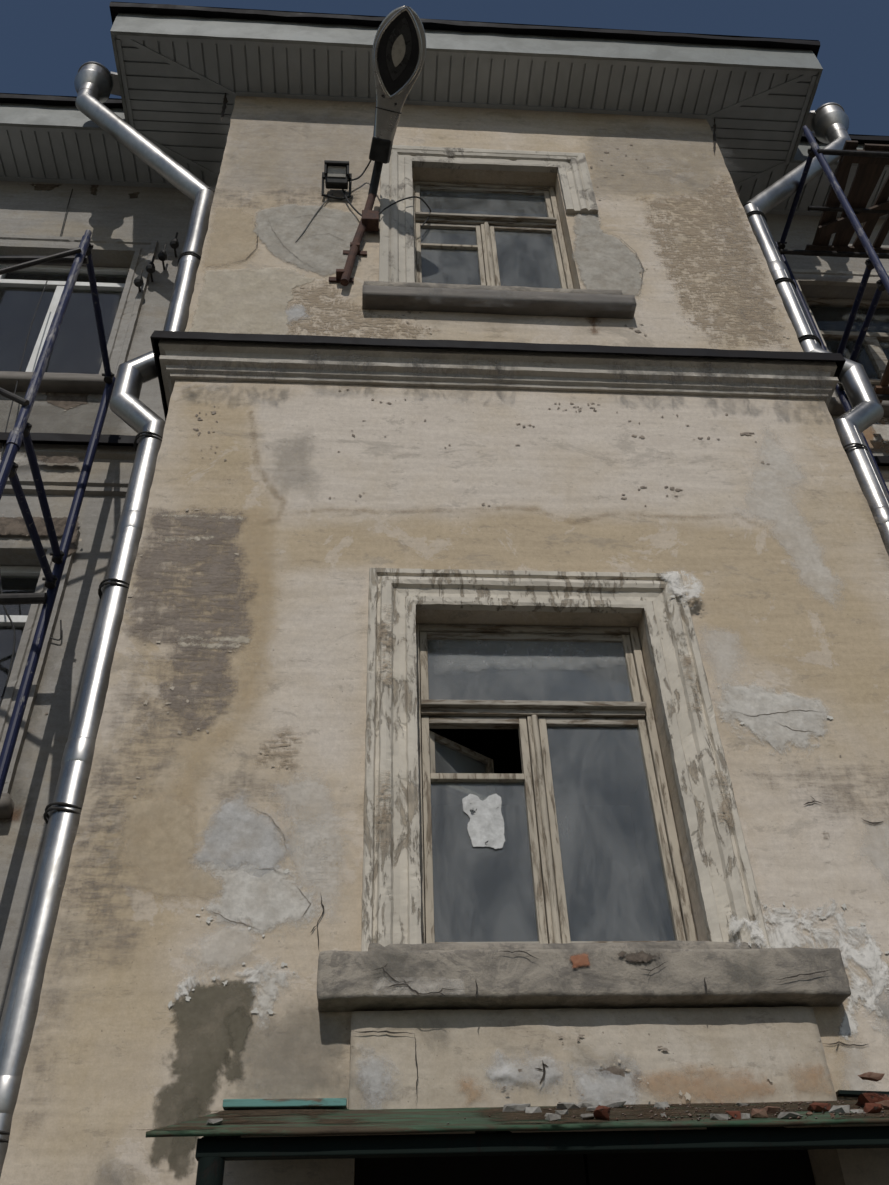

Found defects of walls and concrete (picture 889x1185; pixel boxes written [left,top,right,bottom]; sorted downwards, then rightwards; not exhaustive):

flaking render [573,213,648,295]
flaking render [717,684,834,752]
flaking render [196,858,315,937]
flaking render [728,916,770,948]
flaking render [168,962,295,1024]
crack [776,970,829,980]
damp [150,980,256,1177]